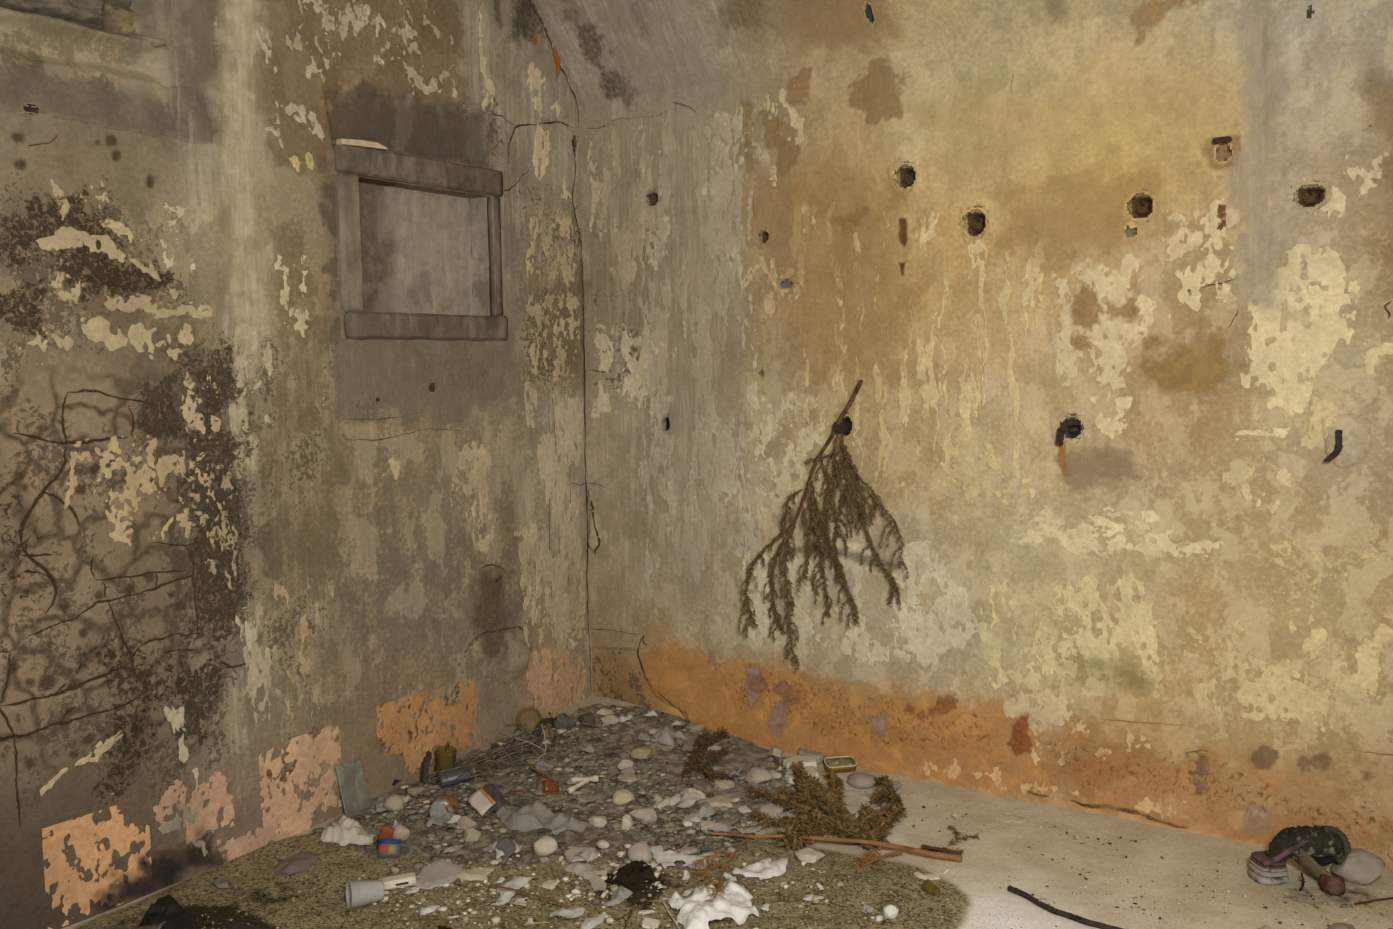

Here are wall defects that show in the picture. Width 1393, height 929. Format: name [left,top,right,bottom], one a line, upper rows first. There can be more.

peeling [256,0,458,172]
leakage [580,26,633,106]
peeling [1,179,247,589]
peeling [234,342,274,399]
crack [490,4,698,719]
peeling [514,58,1393,799]
rust [1058,443,1068,476]
peeling [40,574,342,929]
peeling [376,676,482,774]
leakage [744,667,798,736]
leakage [907,695,956,720]
leakage [1252,746,1278,768]